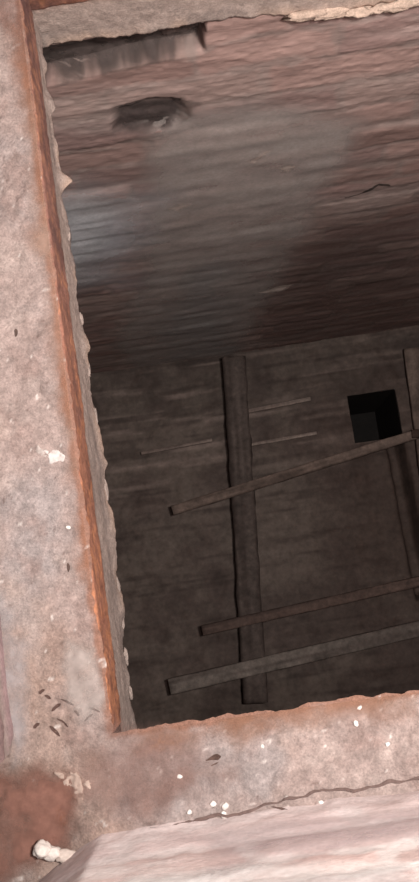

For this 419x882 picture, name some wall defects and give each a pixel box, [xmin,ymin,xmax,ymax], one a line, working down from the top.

spalling [282,0,419,22]
rust [35,214,51,257]
crack [150,776,419,828]